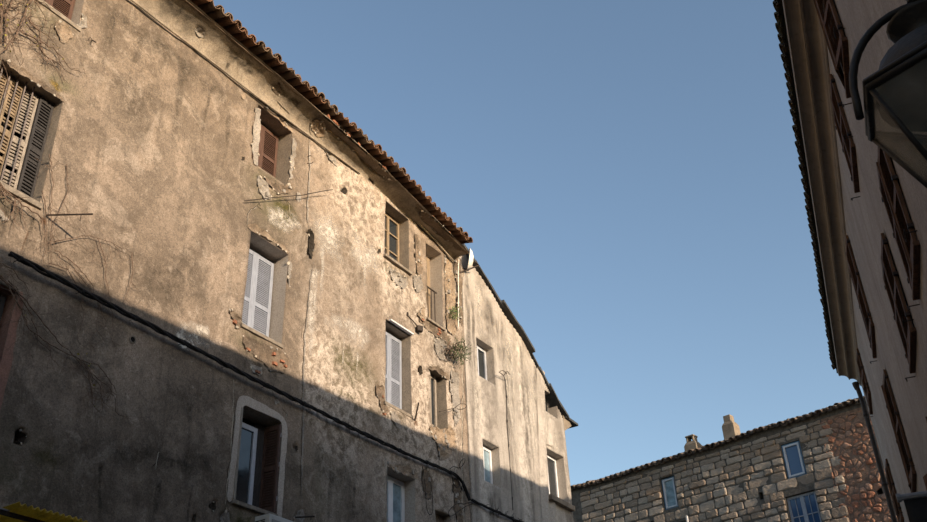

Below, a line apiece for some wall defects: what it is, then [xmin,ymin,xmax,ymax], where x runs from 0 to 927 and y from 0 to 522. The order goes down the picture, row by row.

flaking render [251,106,297,200]
flaking render [389,234,423,289]
flaking render [229,308,290,376]
flaking render [418,254,464,460]
flaking render [375,384,402,429]
flaking render [387,461,433,502]